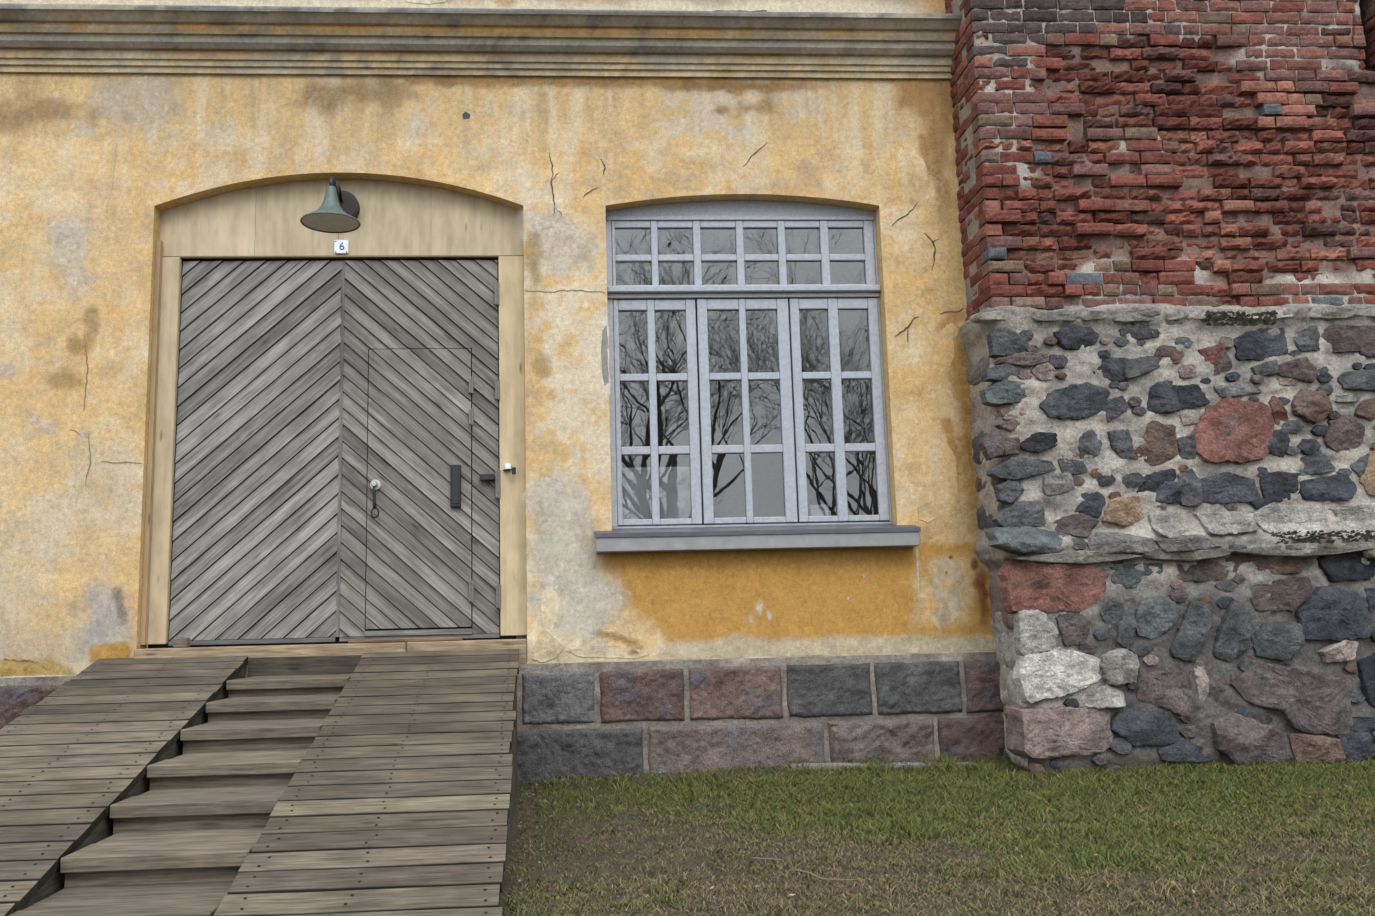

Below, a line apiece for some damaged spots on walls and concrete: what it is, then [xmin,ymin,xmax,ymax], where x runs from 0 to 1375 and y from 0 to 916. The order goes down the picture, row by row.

crack [549,152,606,223]
crack [891,202,938,271]
crack [525,287,606,295]
crack [70,337,142,486]